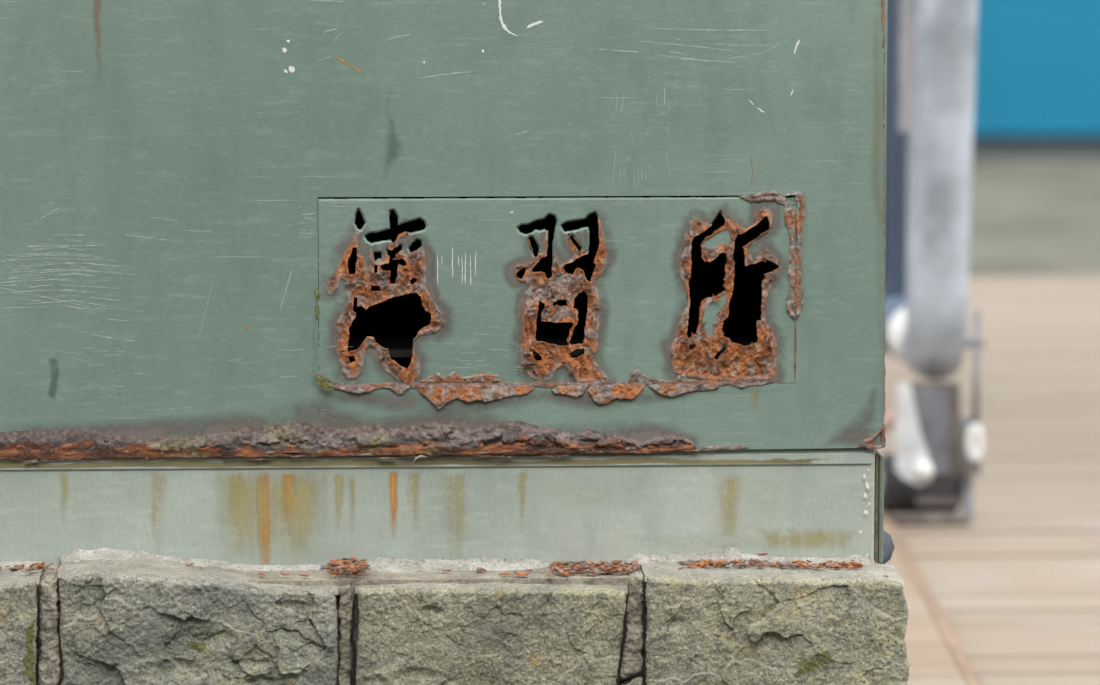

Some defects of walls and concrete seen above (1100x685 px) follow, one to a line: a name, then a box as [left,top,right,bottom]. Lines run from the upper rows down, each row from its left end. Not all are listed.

corrosion [339,232,450,361]
corrosion [505,229,588,341]
corrosion [0,394,815,555]